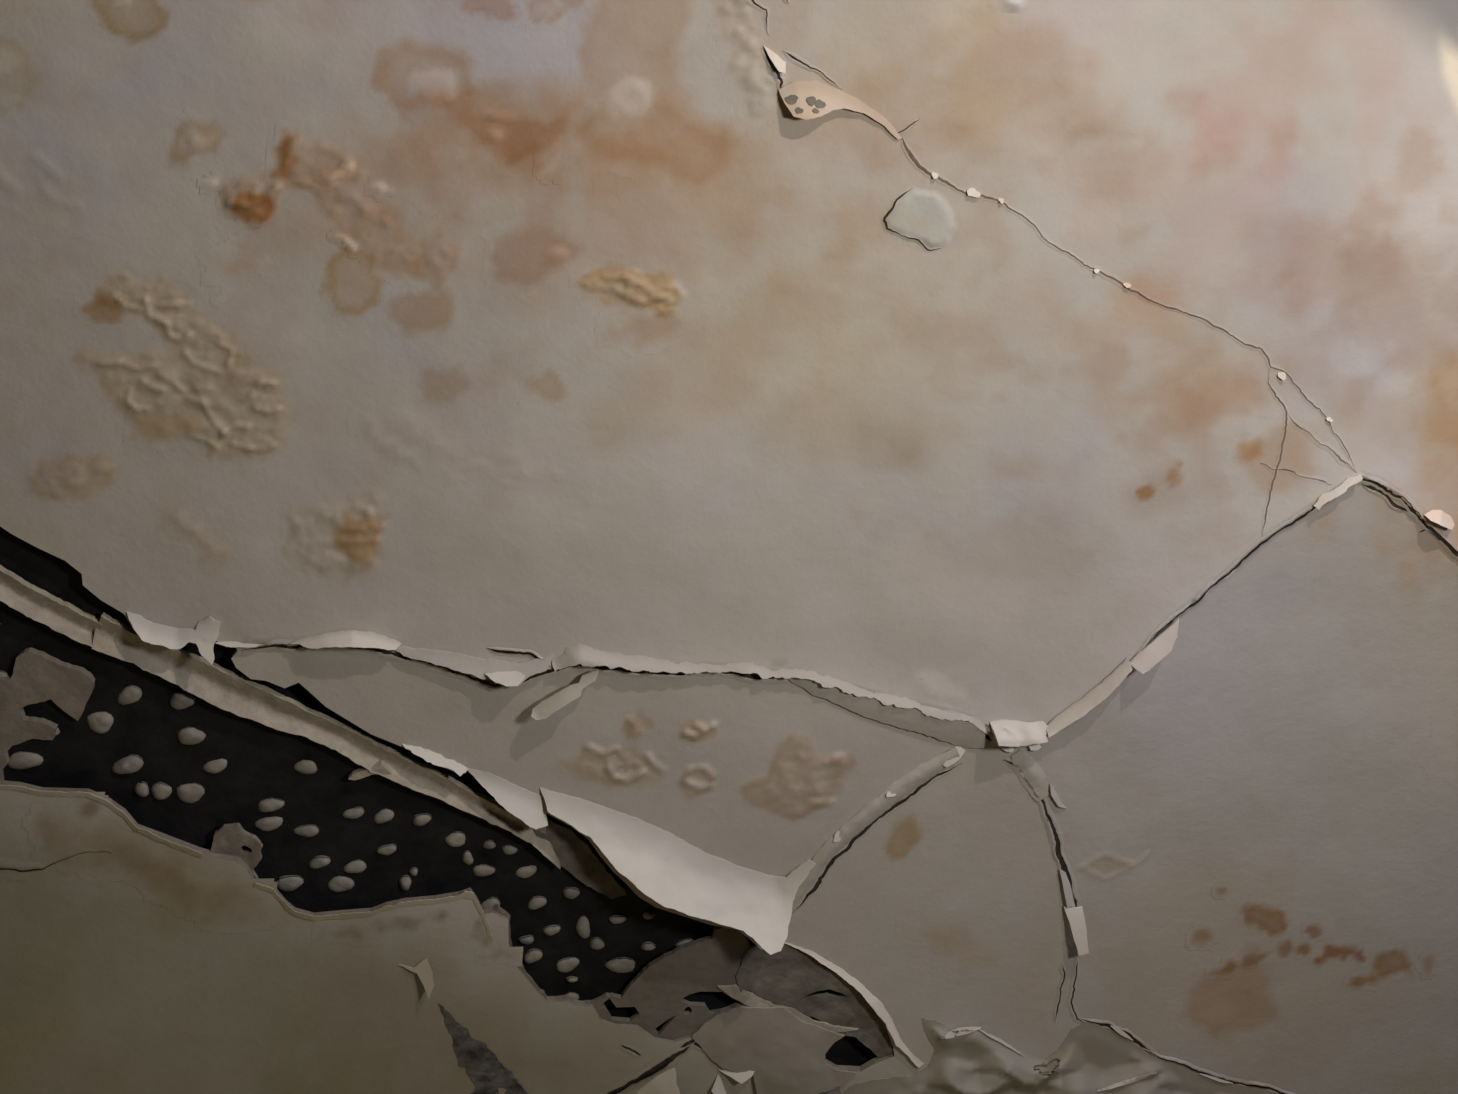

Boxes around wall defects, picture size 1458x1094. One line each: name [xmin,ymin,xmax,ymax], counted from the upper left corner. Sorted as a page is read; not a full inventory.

damp [158,109,234,180]
damp [360,0,759,196]
peeling [746,0,921,139]
damp [479,211,592,301]
peeling [881,187,941,252]
damp [312,240,478,417]
damp [514,364,581,409]
crack [241,136,1458,913]
damp [1224,409,1331,503]
spalling [0,527,1296,1094]
corrosion [1169,883,1438,1055]
crack [595,1037,705,1094]